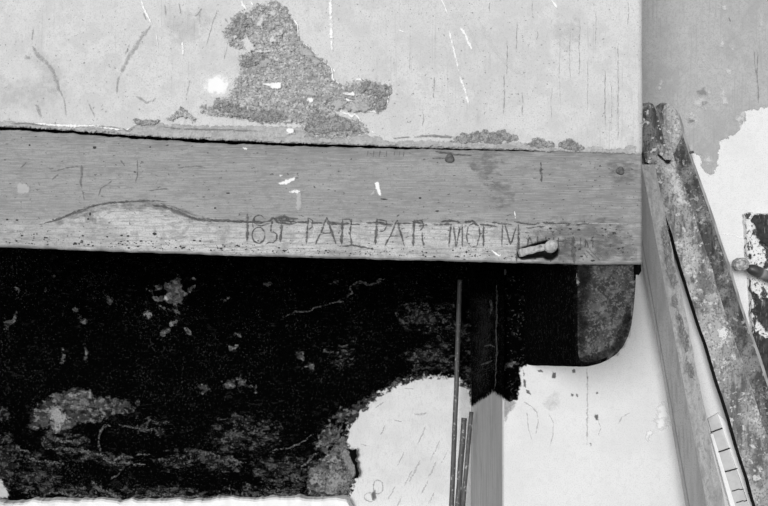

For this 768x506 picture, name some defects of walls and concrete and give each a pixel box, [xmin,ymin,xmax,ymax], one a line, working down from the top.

spalling [0,0,647,164]
peeling [642,0,768,174]
peeling [146,285,192,337]
peeling [295,351,315,371]
peeling [323,340,356,369]
peeling [389,340,471,389]
spalling [0,387,170,499]
spalling [150,423,359,497]